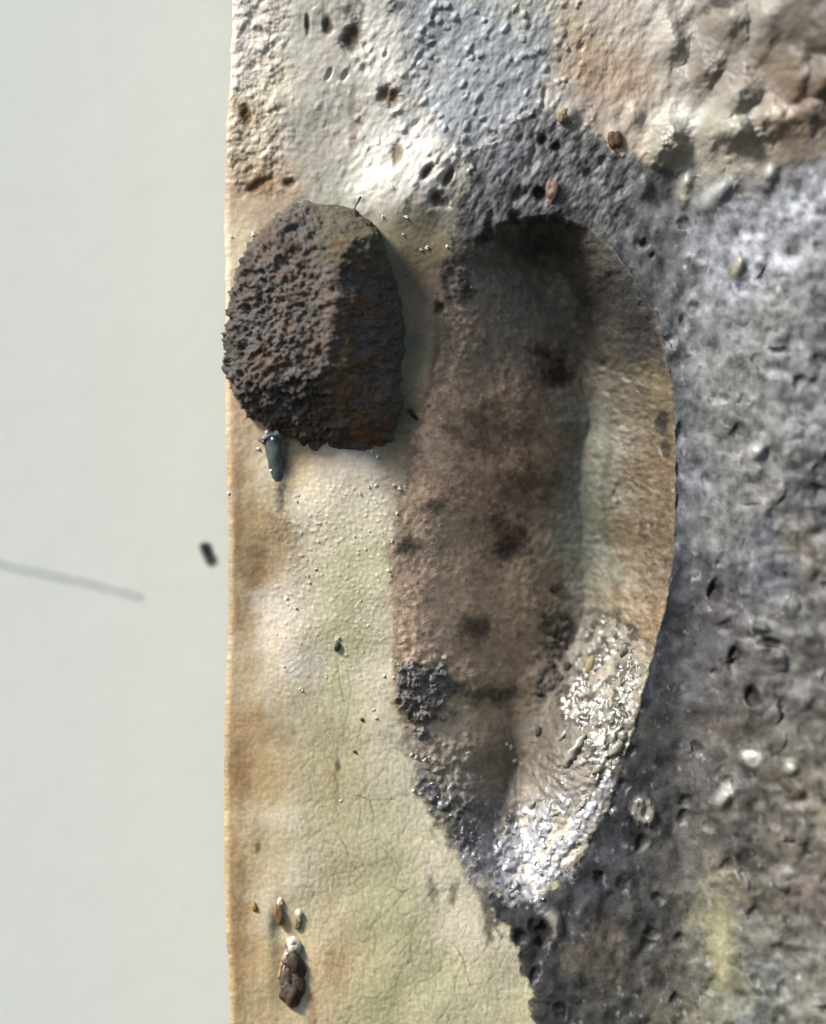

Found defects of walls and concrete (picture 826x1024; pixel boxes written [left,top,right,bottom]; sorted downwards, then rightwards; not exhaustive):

spalling [388,110,826,1024]
water stain [655,412,670,457]
water stain [414,611,643,941]
water stain [709,914,731,987]